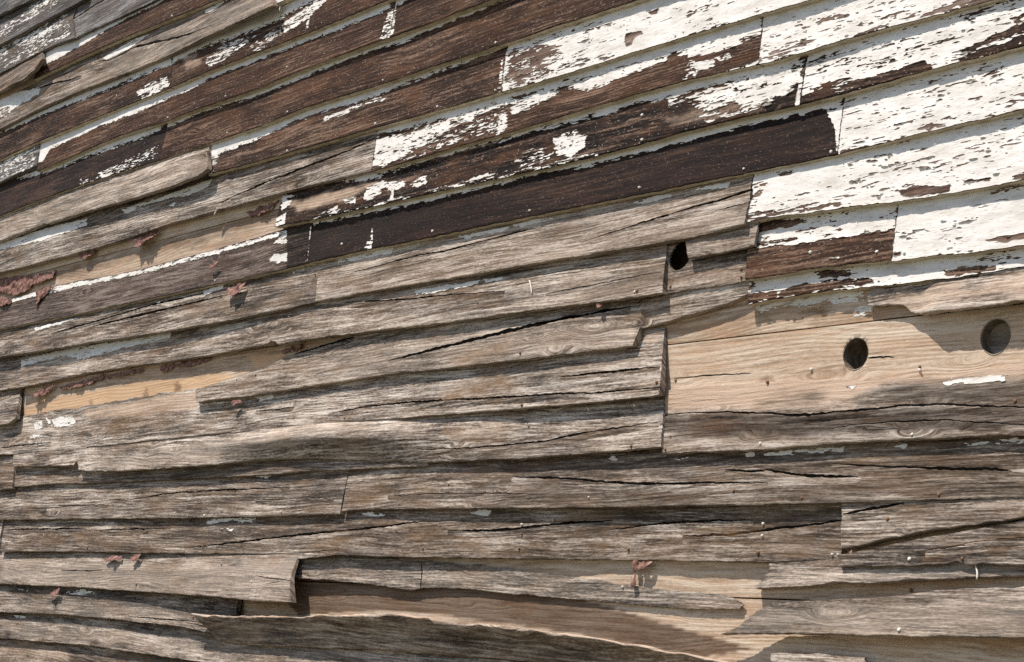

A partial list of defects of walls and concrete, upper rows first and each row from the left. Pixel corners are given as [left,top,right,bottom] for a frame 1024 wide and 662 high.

peeling [0,0,502,184]
peeling [122,0,1024,317]
peeling [0,194,294,303]
peeling [21,332,171,367]
crack [50,293,223,337]
crack [387,272,661,368]
crack [0,366,1024,587]